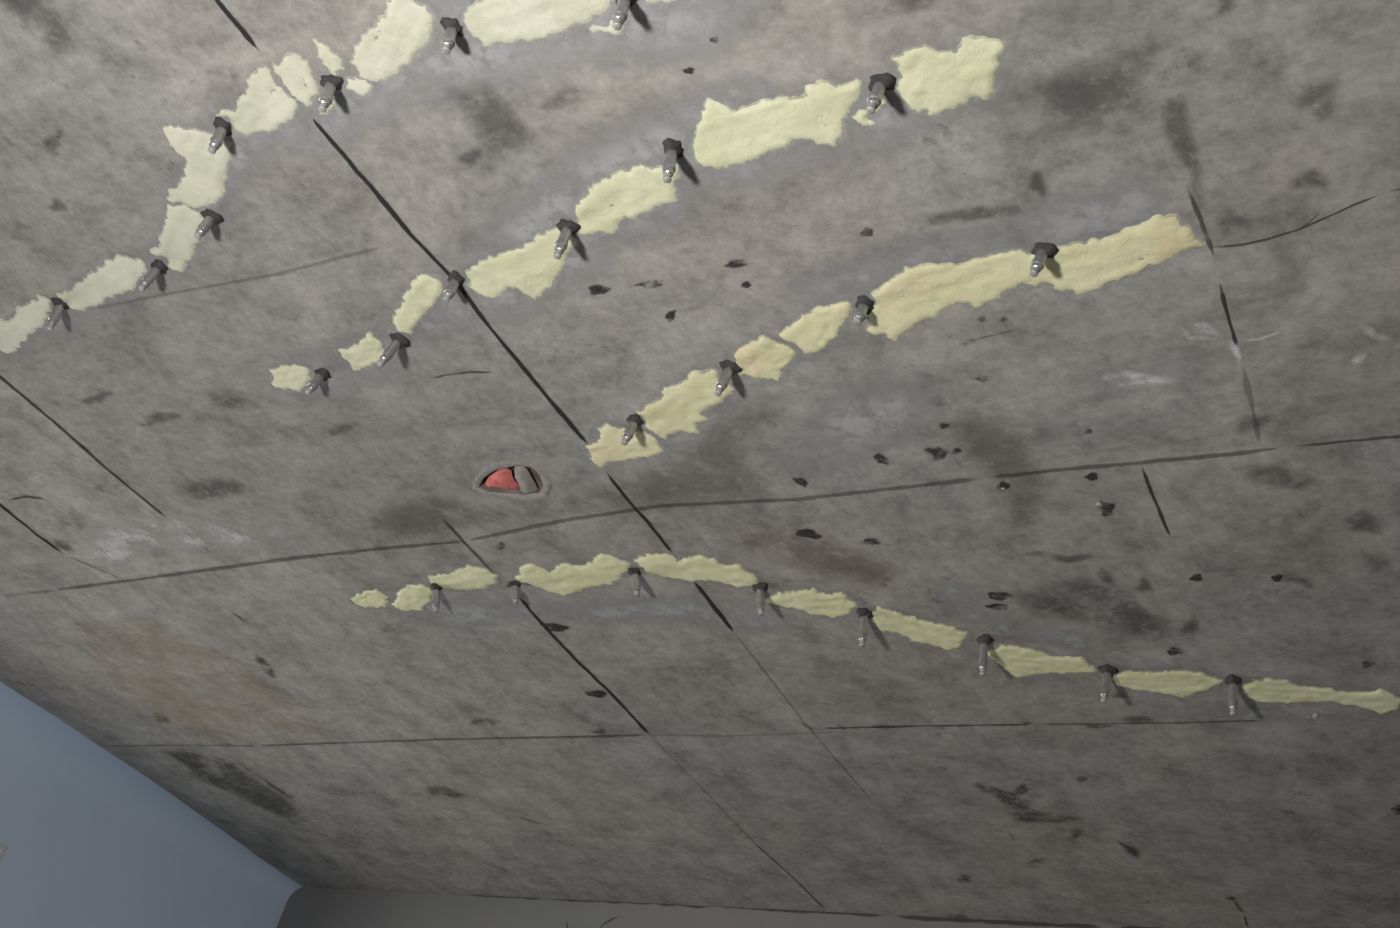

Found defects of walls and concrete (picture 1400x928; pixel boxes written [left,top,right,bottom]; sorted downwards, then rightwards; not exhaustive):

crack [267,364,312,393]
crack [0,0,677,354]
crack [338,34,1012,371]
crack [585,189,1400,468]
crack [350,552,1400,714]